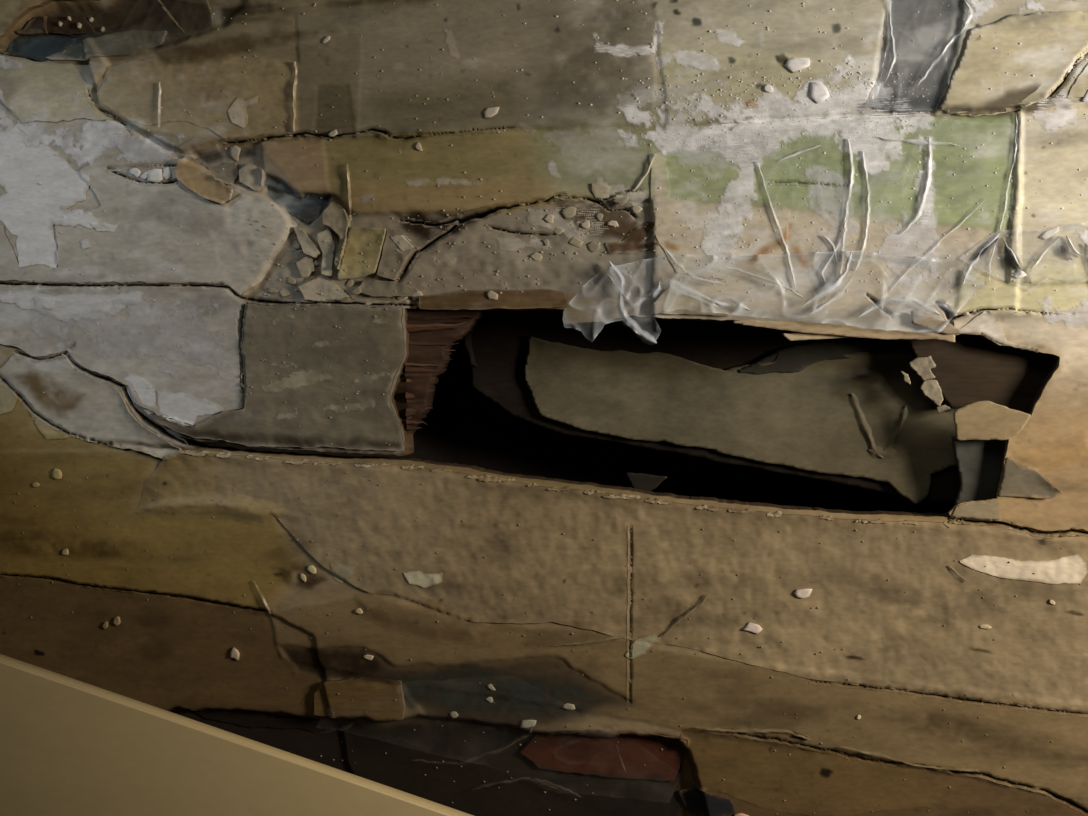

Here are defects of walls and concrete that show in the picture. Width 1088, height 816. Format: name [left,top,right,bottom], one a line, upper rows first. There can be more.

water stain [962,0,993,28]
water stain [1019,0,1044,10]
water stain [656,29,744,85]
crack [1048,49,1088,99]
peeling [0,122,119,268]
water stain [618,56,1076,291]
crack [0,185,644,407]
peeling [124,375,223,427]
spalling [195,339,954,513]
crack [950,516,1088,538]
peeling [960,555,1088,584]
crack [732,732,1088,816]